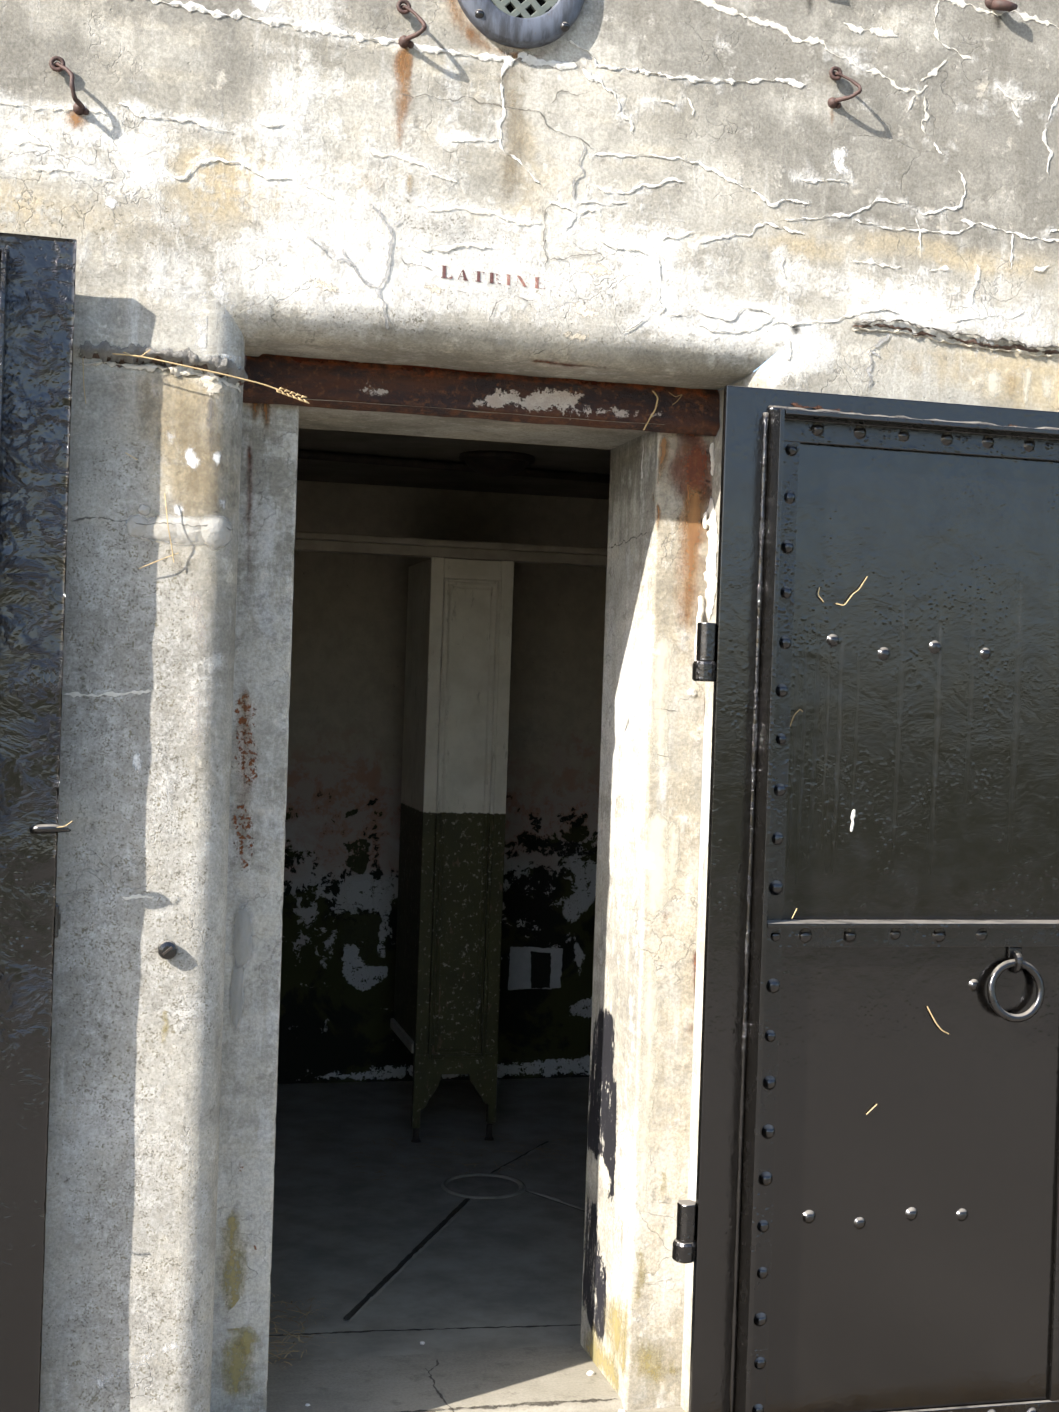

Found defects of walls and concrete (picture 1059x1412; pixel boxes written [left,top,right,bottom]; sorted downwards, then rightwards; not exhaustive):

rust [395,49,412,137]
crack [0,100,335,201]
crack [151,0,1059,388]
rust [291,356,492,376]
spalling [473,387,663,420]
spalling [185,449,220,468]
rust [658,433,711,619]
rust [234,694,258,786]
peeling [339,878,395,992]
peeling [508,840,597,990]
leakage [223,1330,258,1394]
crack [426,1360,454,1412]